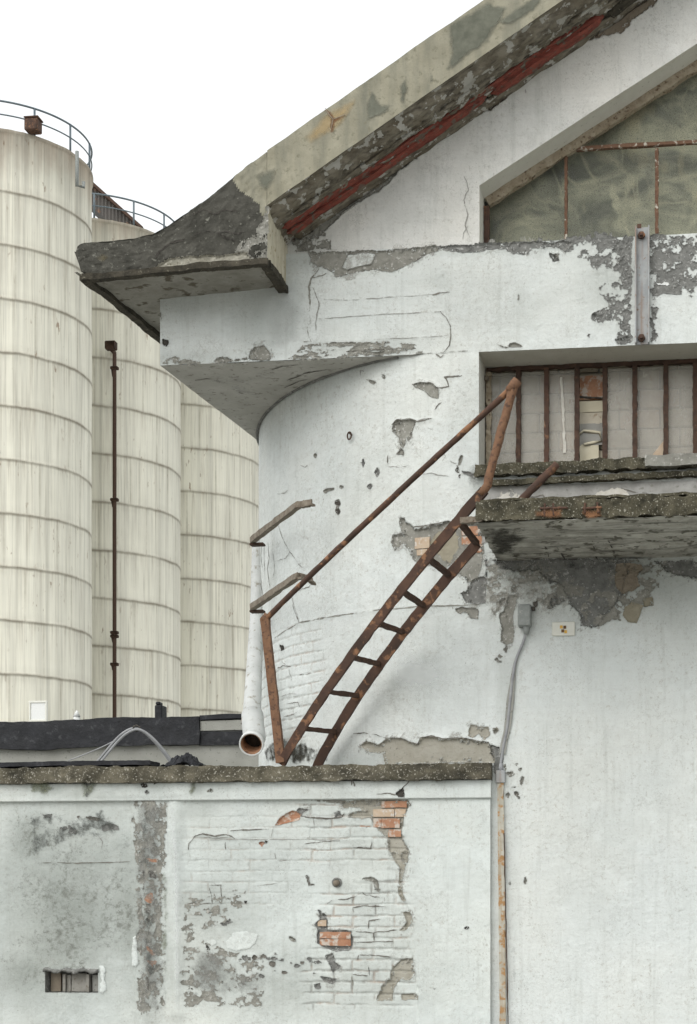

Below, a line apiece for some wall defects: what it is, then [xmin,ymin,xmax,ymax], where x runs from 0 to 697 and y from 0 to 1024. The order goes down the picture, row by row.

spalling [589,0,657,40]
spalling [157,206,270,267]
peeling [288,341,422,361]
crack [307,269,459,358]
peeling [650,233,697,342]
spalling [361,375,462,489]
spalling [390,517,697,663]
spalling [353,723,524,799]
mould [32,811,119,851]
spalling [259,799,413,935]
peeling [179,877,381,1008]
spalling [377,958,418,1001]